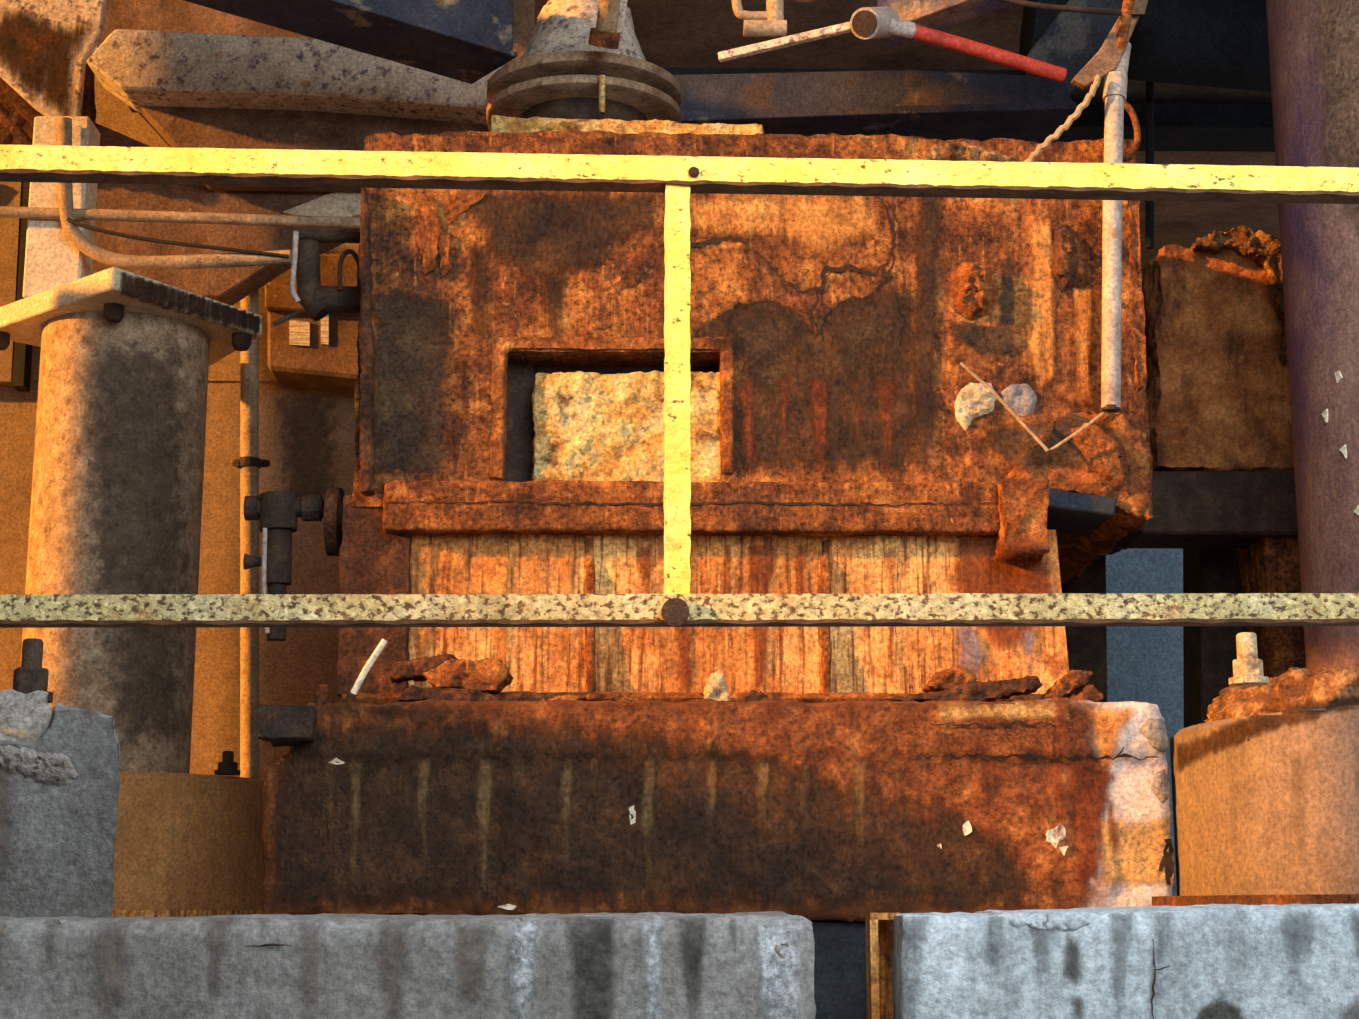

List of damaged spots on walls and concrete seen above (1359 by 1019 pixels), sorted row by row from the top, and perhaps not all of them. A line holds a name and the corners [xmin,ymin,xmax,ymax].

corrosion [1313,0,1359,168]
crack [690,236,740,247]
crack [791,196,903,371]
corrosion [0,168,1359,471]
corrosion [416,544,431,594]
corrosion [487,544,509,594]
corrosion [638,545,652,584]
corrosion [749,546,776,594]
corrosion [797,546,808,594]
corrosion [951,539,1047,594]
corrosion [0,618,1359,912]
damp [1066,938,1081,981]